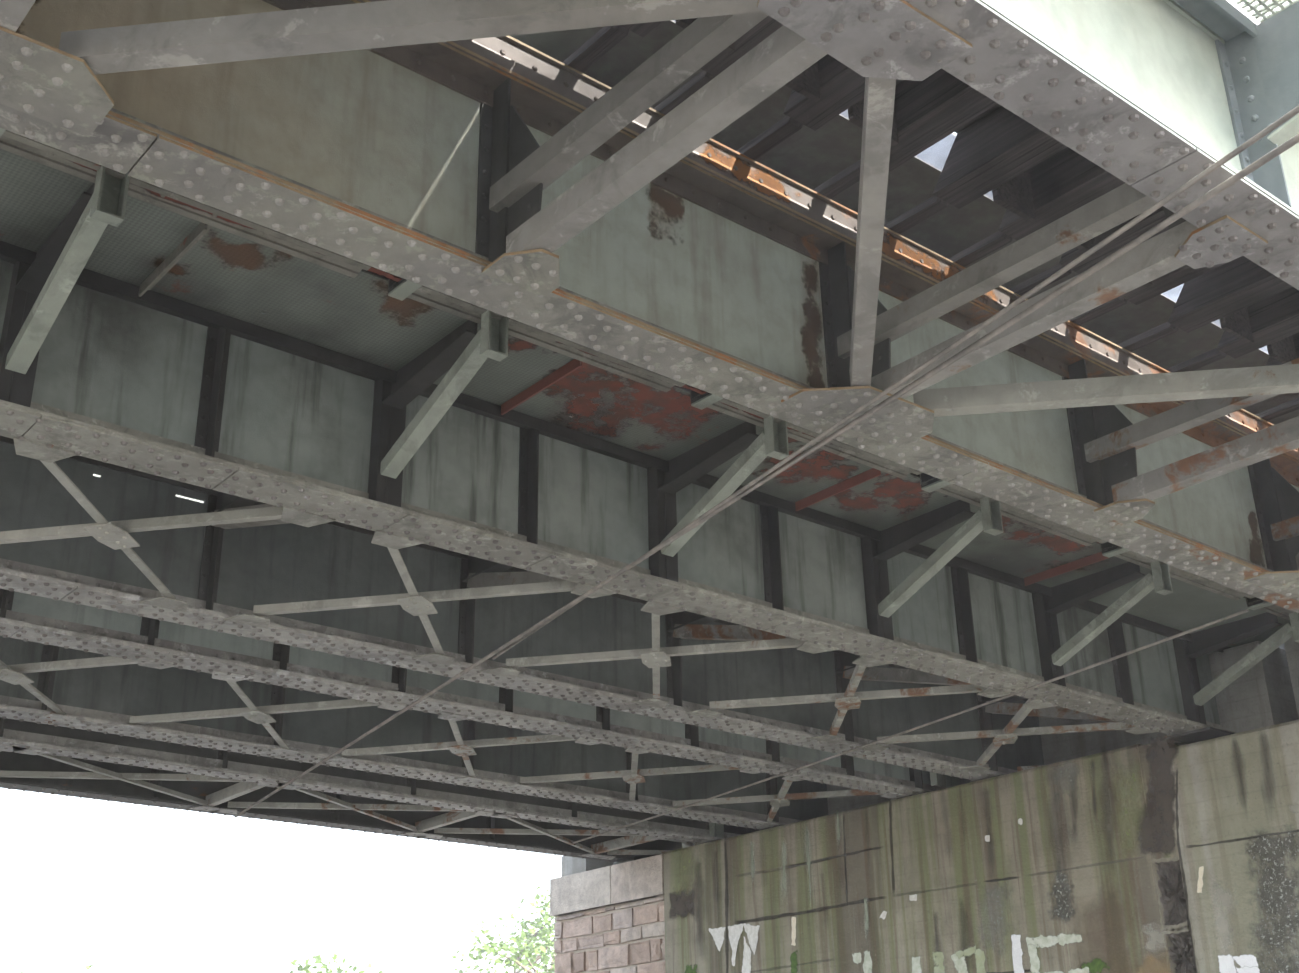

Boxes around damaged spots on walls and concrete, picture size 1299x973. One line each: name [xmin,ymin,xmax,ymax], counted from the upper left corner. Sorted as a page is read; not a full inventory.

rust [131,183,299,270]
rust [367,267,434,326]
rust [649,183,685,239]
rust [699,145,800,203]
rust [800,265,825,388]
rust [882,232,962,281]
water stain [1137,736,1178,855]
water stain [1052,772,1076,921]